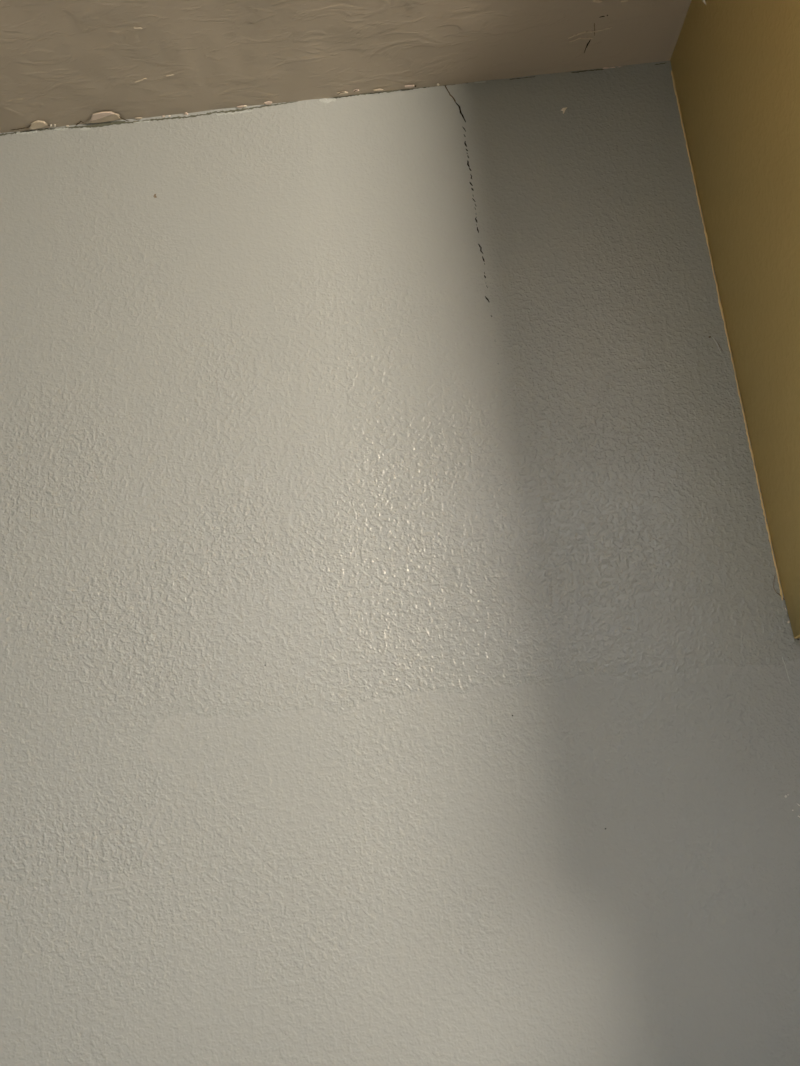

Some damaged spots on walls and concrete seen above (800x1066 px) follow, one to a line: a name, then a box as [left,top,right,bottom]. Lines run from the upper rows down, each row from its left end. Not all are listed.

crack [571,15,608,73]
crack [0,76,535,317]